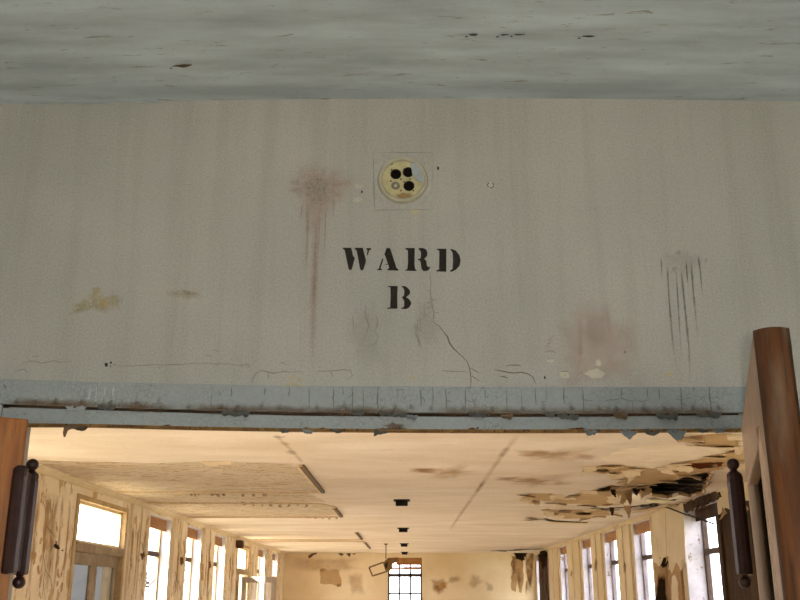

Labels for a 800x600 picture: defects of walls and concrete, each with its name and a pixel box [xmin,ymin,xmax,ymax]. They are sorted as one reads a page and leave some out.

crack [318,369,398,410]
crack [420,272,713,411]
water stain [668,264,701,335]
flaking render [519,411,746,521]
flaking render [32,491,69,600]
spalling [320,568,342,587]